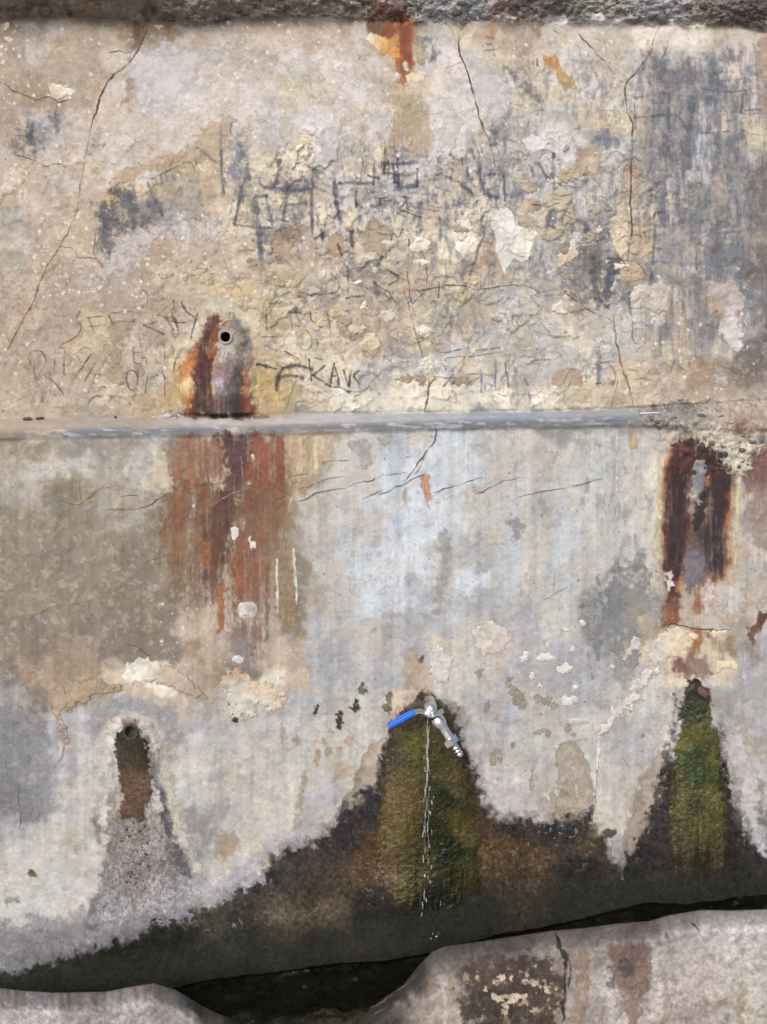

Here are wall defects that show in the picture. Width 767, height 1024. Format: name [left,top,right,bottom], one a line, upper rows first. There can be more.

crack [0,30,147,349]
rust [363,0,426,84]
crack [458,40,496,168]
peeling [490,134,672,315]
crack [554,23,667,273]
rust [136,314,338,672]
crack [66,382,603,510]
spalling [639,399,767,477]
rust [655,436,767,628]
peeling [47,657,208,744]
peeling [218,655,288,722]
water stain [0,664,767,993]